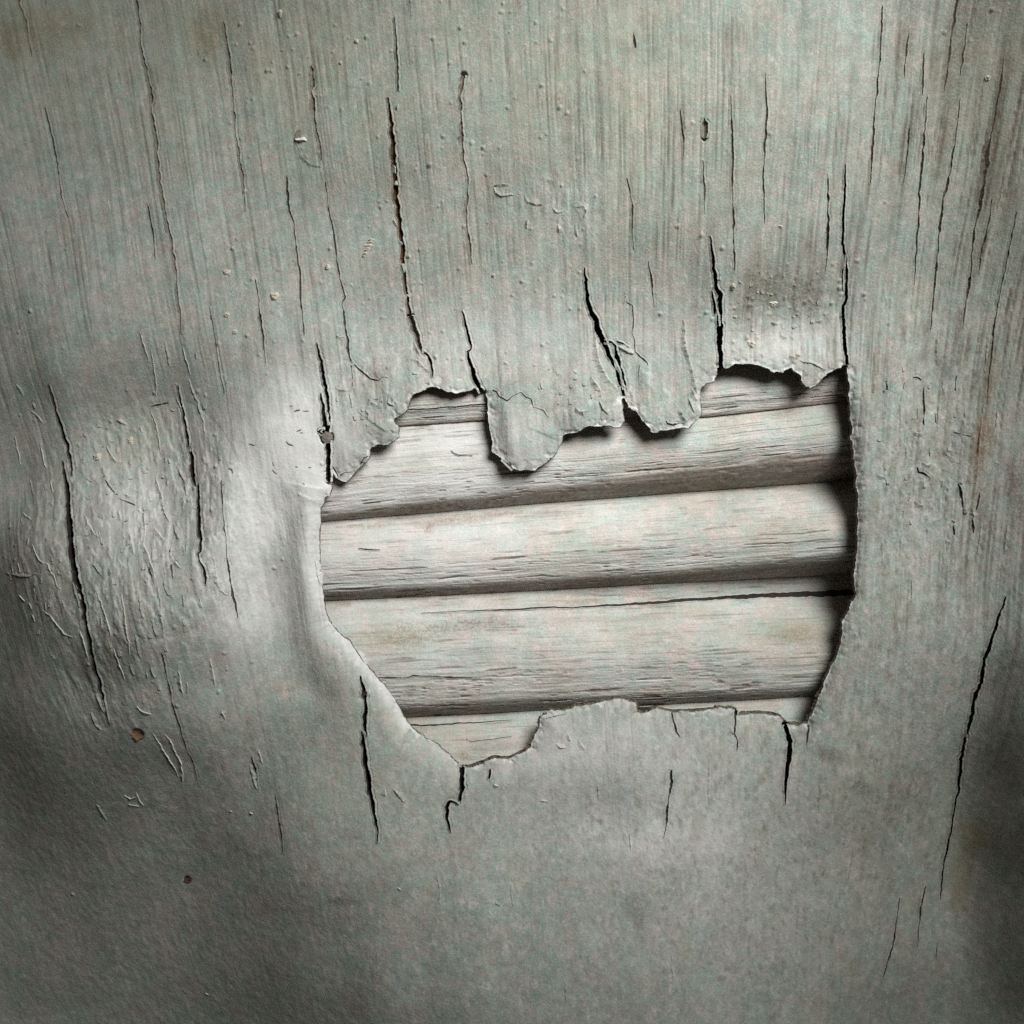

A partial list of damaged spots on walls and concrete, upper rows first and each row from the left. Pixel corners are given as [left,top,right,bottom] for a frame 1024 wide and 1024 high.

crack [631,33,639,48]
crack [47,384,240,726]
crack [249,66,389,485]
crack [385,17,436,378]
spalling [312,319,858,767]
crack [582,177,657,396]
crack [664,419,684,428]
crack [677,73,770,370]
crack [358,674,472,843]
crack [410,719,530,834]
crack [638,705,812,805]
crack [881,595,1009,979]